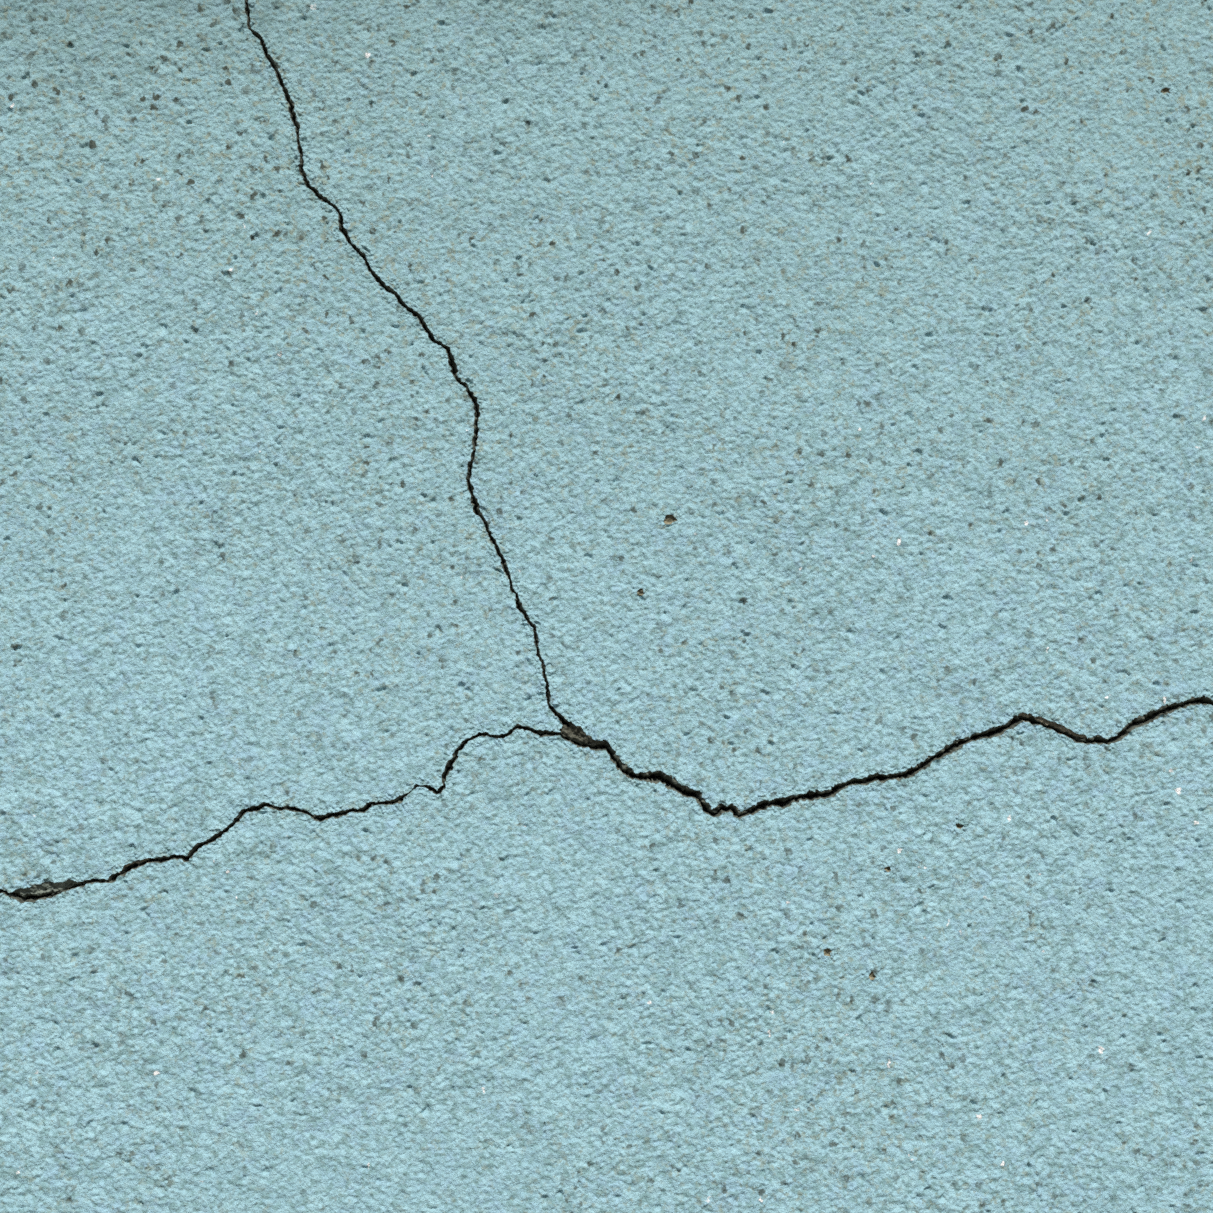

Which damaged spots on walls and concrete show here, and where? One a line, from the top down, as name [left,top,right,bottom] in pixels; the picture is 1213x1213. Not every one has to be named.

crack [0,0,1213,903]